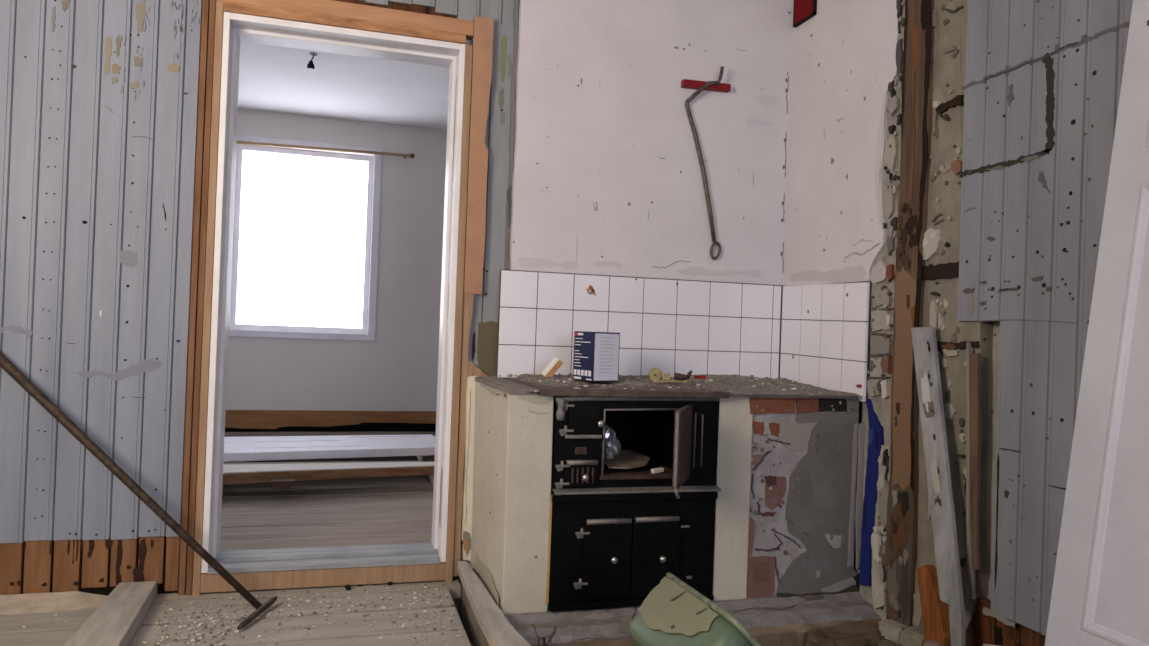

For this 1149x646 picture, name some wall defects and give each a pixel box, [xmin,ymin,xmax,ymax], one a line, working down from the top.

peeling [104,34,142,89]
peeling [922,228,941,260]
flaking render [746,0,905,621]
peeling [929,300,945,330]